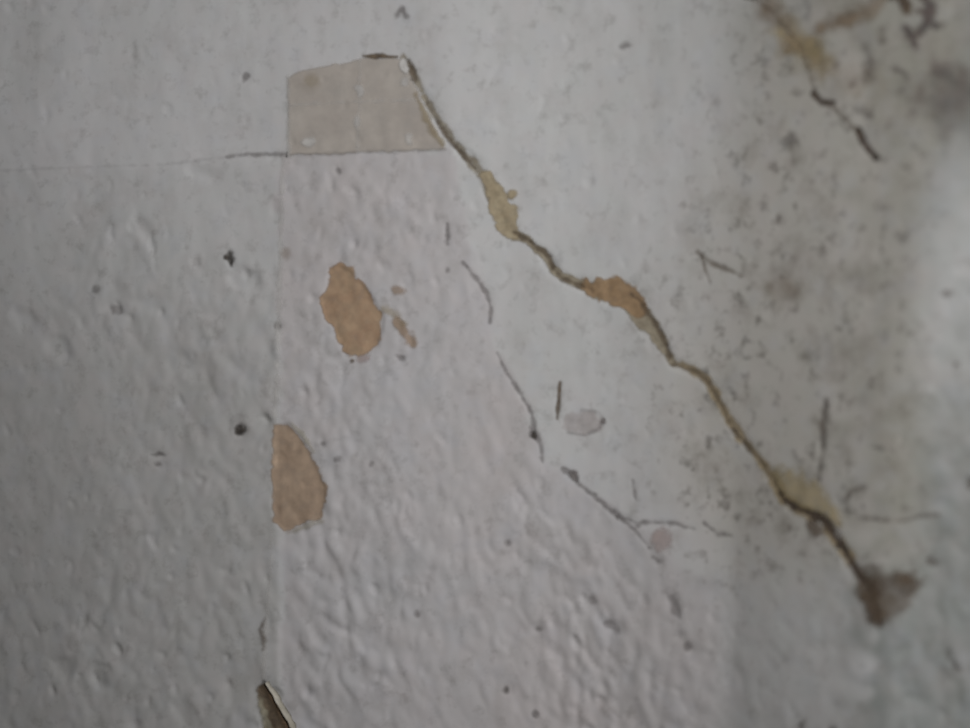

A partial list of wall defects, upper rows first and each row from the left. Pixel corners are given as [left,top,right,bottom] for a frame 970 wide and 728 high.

crack [856,127,879,161]
peeling [320,263,382,362]
peeling [393,317,416,347]
crack [399,55,866,584]
peeling [271,425,328,531]
flaking render [259,684,289,728]